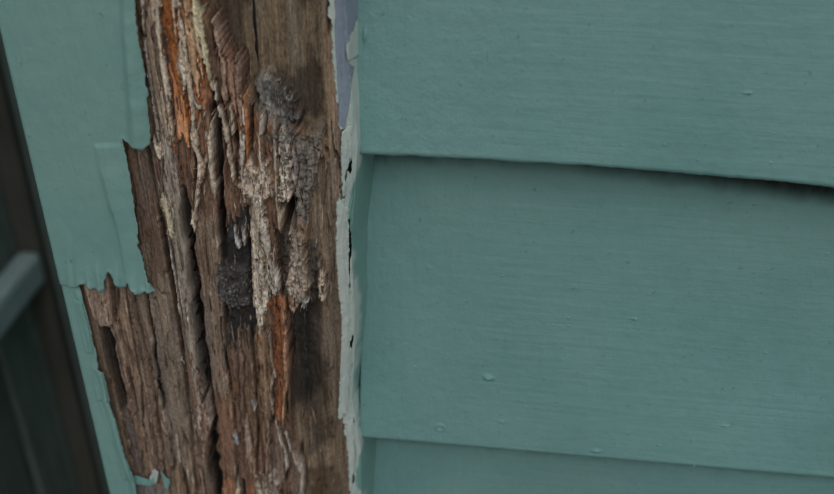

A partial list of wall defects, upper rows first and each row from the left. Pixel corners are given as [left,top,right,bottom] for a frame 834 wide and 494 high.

crack [251,0,259,66]
peeling [85,0,155,295]
crack [212,91,227,217]
peeling [335,0,359,491]
peeling [74,300,93,354]
crack [108,327,127,398]
peeling [93,372,170,490]
crack [154,344,165,418]
crack [188,228,229,392]
crack [211,416,223,494]